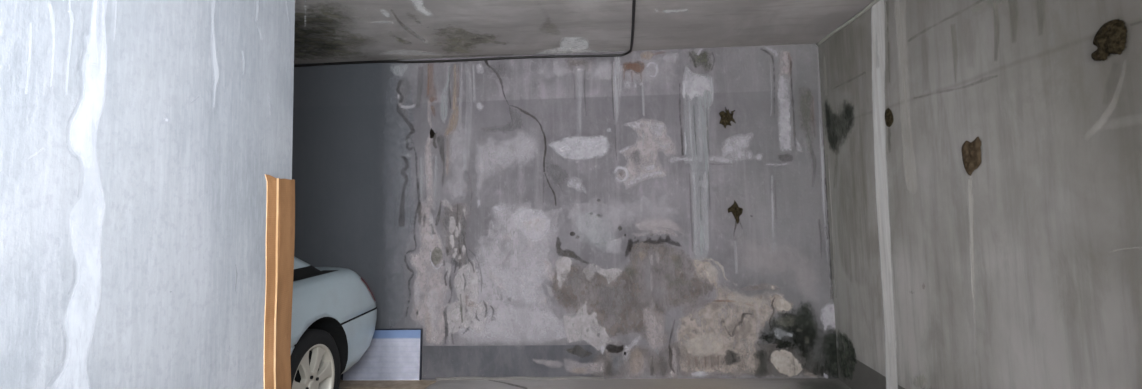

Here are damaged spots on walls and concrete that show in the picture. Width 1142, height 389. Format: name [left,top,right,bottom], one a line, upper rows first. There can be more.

damp [56,0,106,389]
crack [484,60,568,206]
damp [382,0,925,389]
peeling [443,199,494,344]
peeling [547,256,572,296]
peeling [534,301,626,374]
peeling [587,263,622,284]
peeling [669,258,793,377]